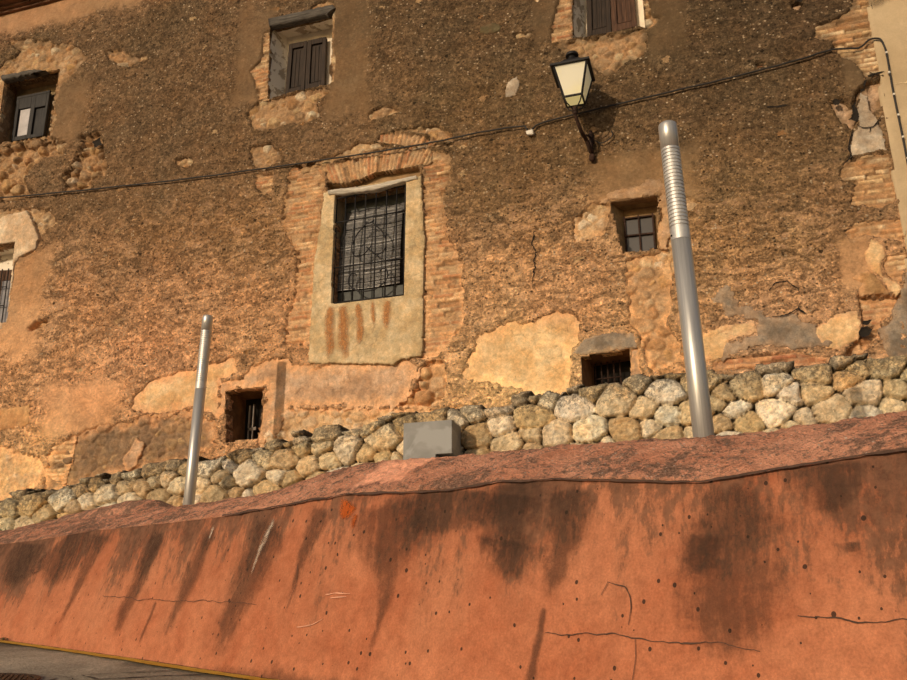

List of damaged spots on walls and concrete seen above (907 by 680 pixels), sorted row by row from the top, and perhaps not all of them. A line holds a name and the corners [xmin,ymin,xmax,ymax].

flaking render [551,0,574,46]
spalling [0,39,86,151]
flaking render [250,32,272,103]
flaking render [814,0,881,130]
spalling [62,133,108,191]
flaking render [840,154,895,208]
peeling [132,131,465,445]
corrosion [325,301,390,355]
peeling [463,311,580,395]
peeling [702,220,906,371]
flaking render [45,436,78,485]
peeling [123,438,146,472]